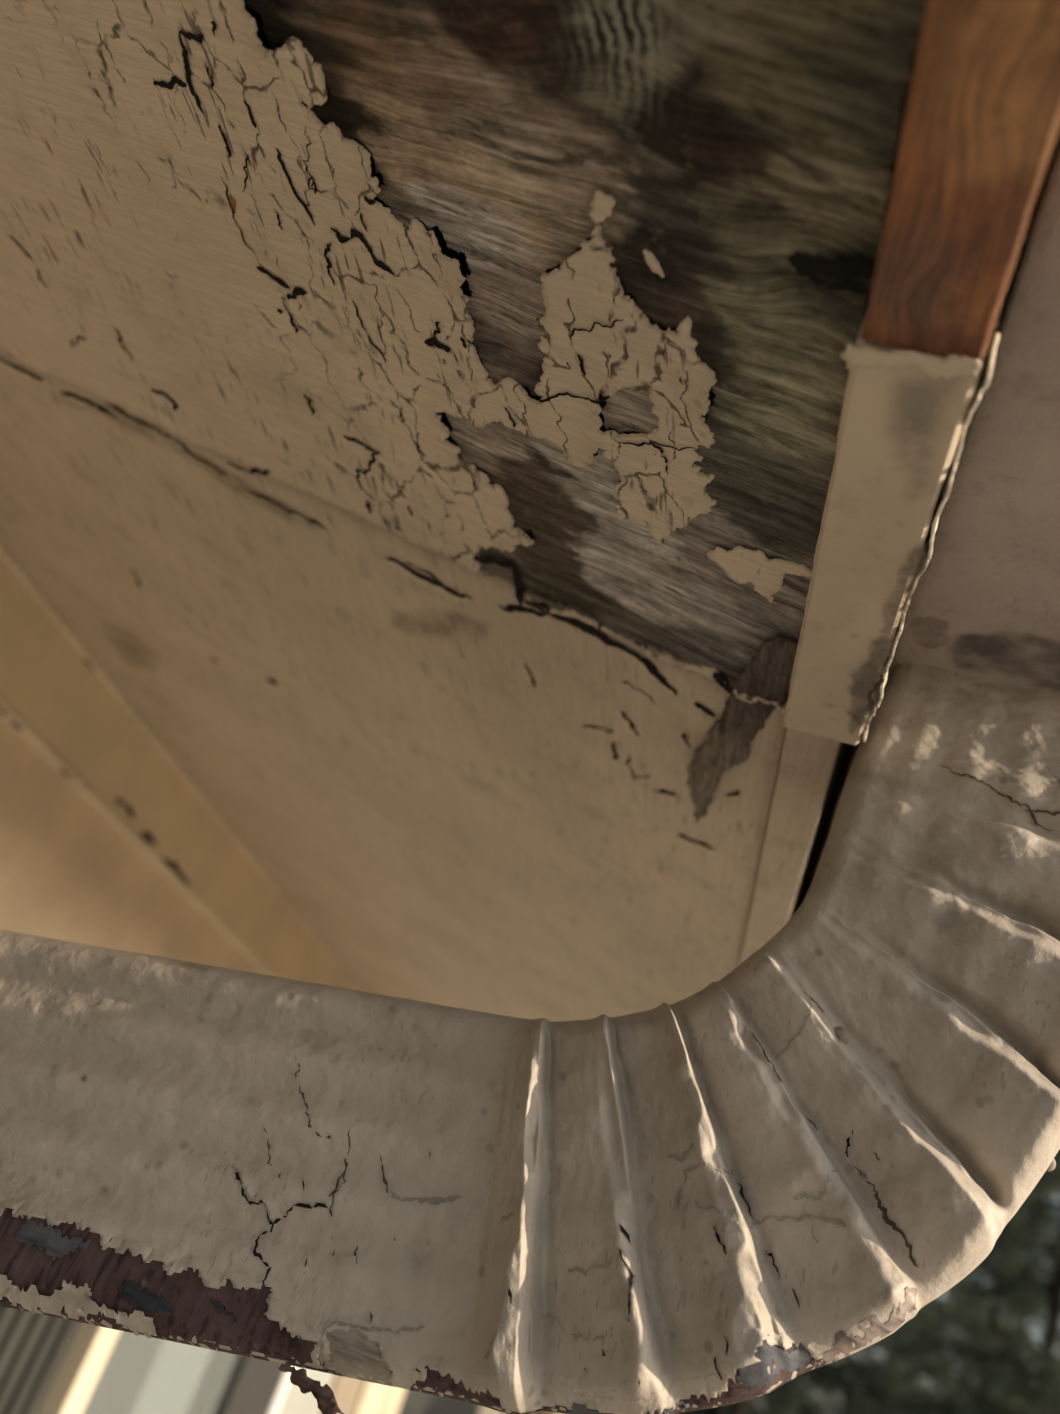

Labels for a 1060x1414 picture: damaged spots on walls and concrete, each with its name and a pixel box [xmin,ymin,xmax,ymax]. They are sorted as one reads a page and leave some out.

crack [153,14,395,363]
crack [0,327,326,530]
crack [341,400,431,517]
crack [424,321,467,364]
peeling [247,0,1034,743]
crack [583,681,675,796]
crack [941,765,1060,831]
crack [752,991,825,1082]
crack [231,1058,465,1284]
peeling [0,1197,918,1414]
crack [714,1335,729,1380]
crack [666,1116,919,1308]